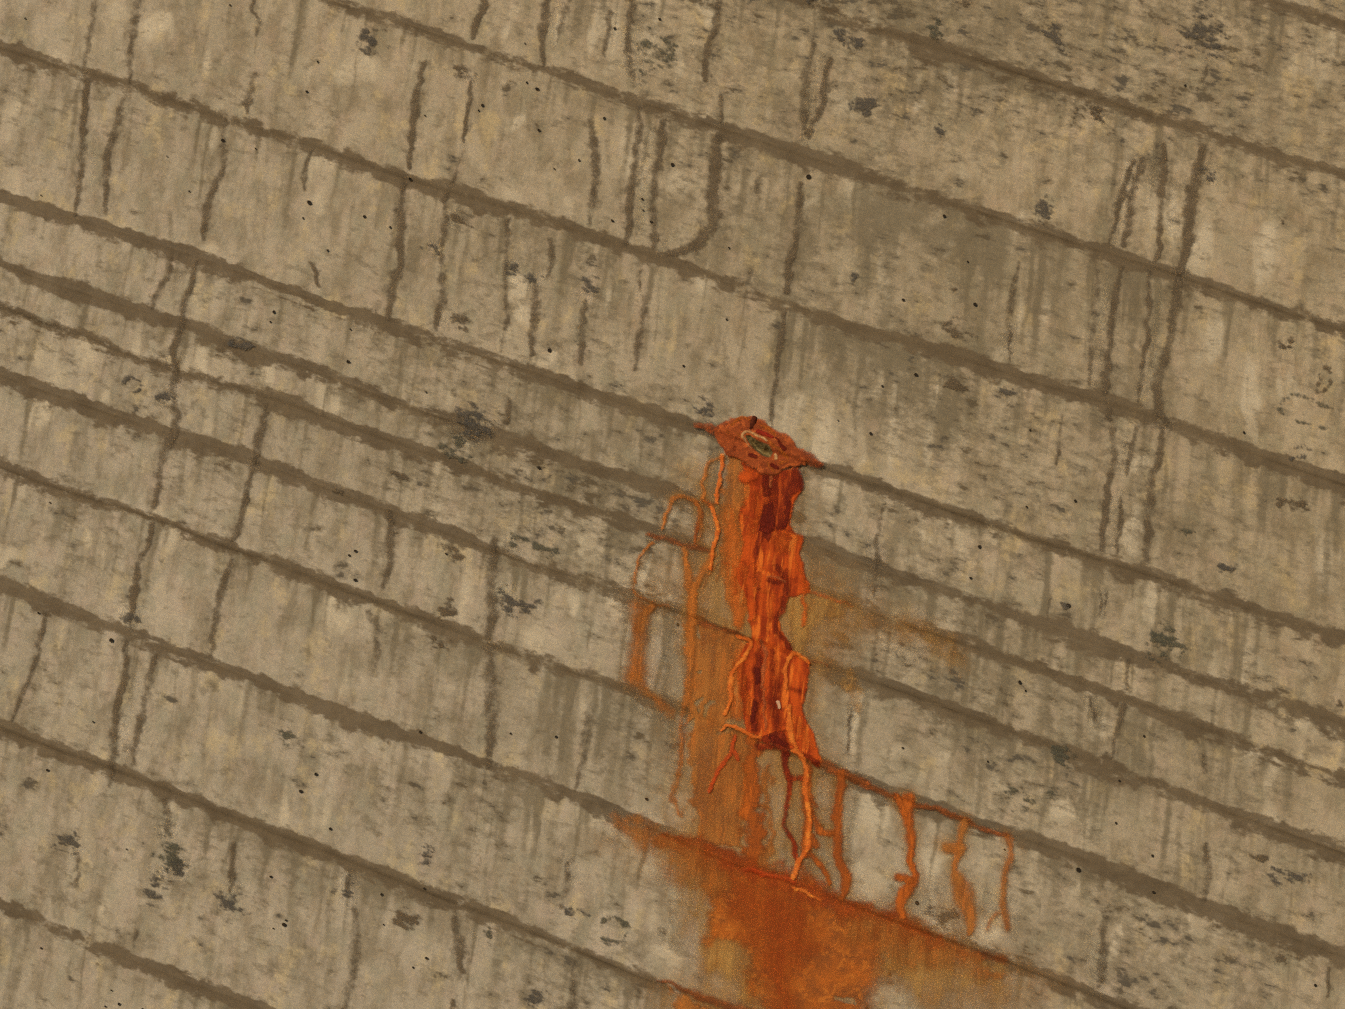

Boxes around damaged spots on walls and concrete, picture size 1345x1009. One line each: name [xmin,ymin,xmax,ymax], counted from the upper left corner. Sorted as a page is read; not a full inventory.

damp [385,61,427,320]
damp [420,173,473,331]
damp [452,64,477,142]
damp [471,0,489,39]
damp [500,218,555,356]
damp [588,128,600,224]
damp [603,0,678,82]
damp [624,93,723,256]
spalling [694,416,824,475]
damp [1088,267,1137,552]
damp [1108,142,1215,561]
corrosion [618,454,1013,1009]